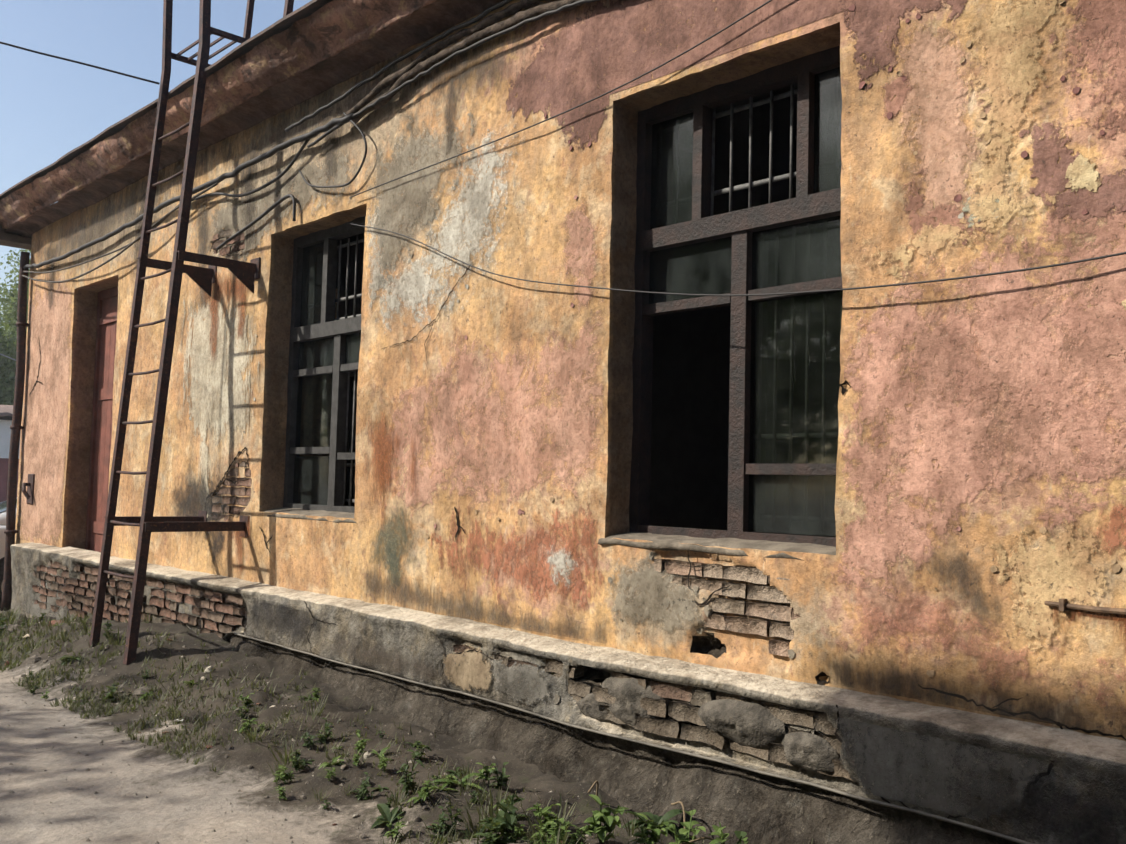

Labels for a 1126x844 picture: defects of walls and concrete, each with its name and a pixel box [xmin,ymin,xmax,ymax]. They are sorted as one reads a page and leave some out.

flaking render [367,107,511,328]
crack [382,264,471,369]
peeling [506,0,1126,671]
peeling [17,283,72,545]
flaking render [181,297,261,521]
peeling [384,321,801,659]
flaking render [32,560,254,638]
damp [365,511,601,639]
flaking render [453,645,859,783]
crack [919,685,1028,716]
crack [1024,760,1054,792]
crack [1055,721,1126,740]